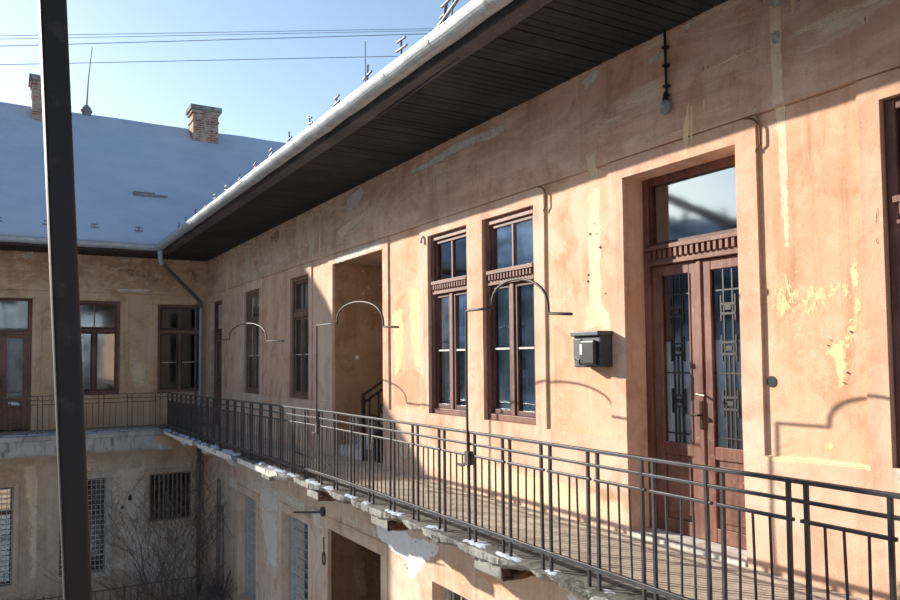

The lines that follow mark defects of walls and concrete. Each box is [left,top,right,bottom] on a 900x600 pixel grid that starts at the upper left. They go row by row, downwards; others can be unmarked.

flaking render [585,188,610,331]
flaking render [820,259,861,387]
flaking render [377,520,439,579]